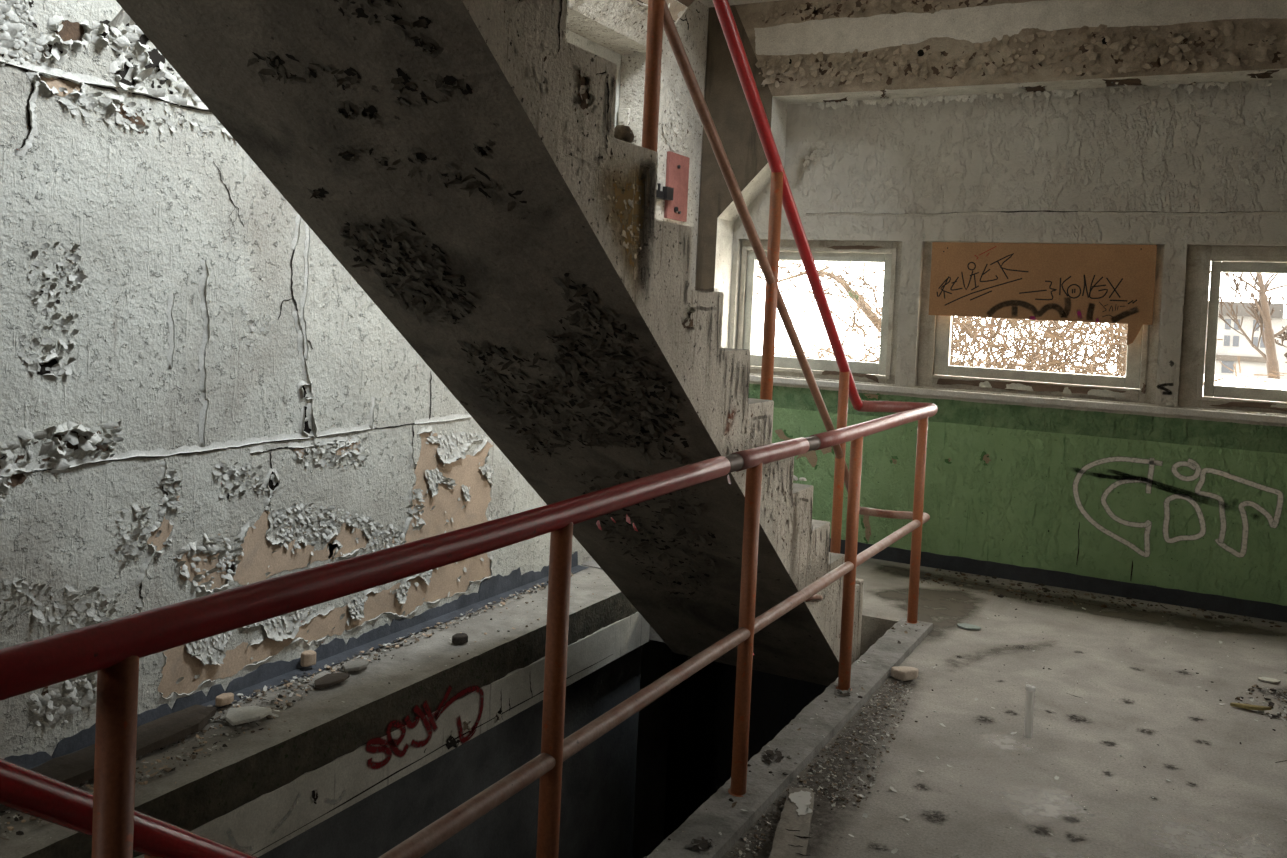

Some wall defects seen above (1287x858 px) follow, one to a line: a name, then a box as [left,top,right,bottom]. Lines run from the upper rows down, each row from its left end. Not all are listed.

crack [0,56,211,157]
flaking render [25,8,232,138]
peeling [247,51,382,124]
peeling [754,0,1287,103]
crack [213,161,244,233]
peeling [334,143,527,211]
crack [0,214,471,511]
peeling [340,215,477,325]
peeling [457,340,690,465]
spalling [681,301,696,335]
peeling [109,426,495,596]
peeling [157,553,493,703]